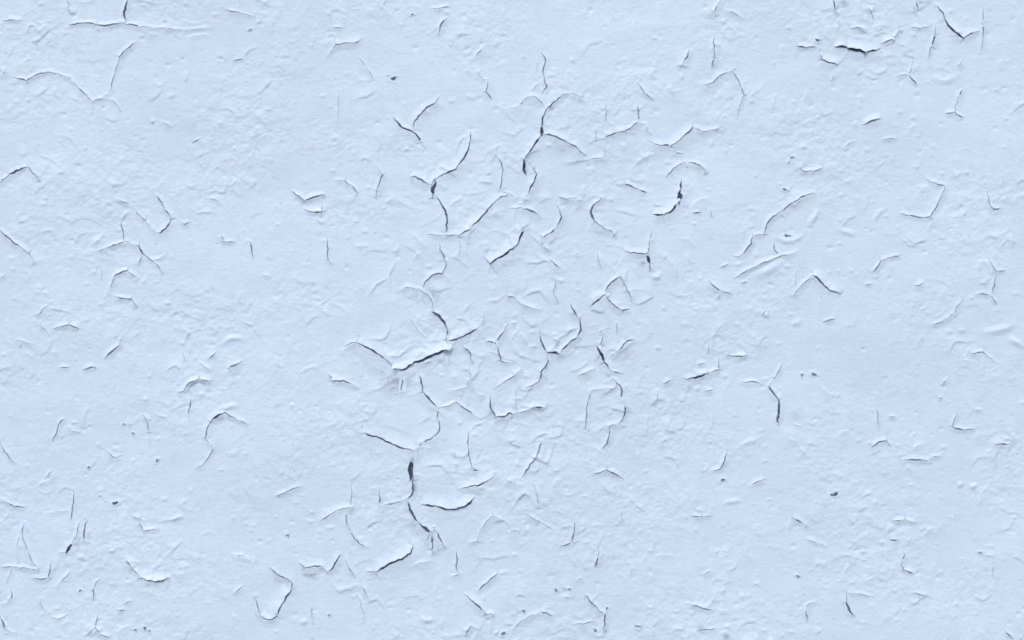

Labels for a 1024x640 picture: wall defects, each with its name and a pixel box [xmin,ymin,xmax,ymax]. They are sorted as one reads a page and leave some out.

peeling [791,23,883,72]
peeling [911,0,980,45]
peeling [482,86,727,281]
peeling [719,155,845,299]
peeling [324,282,487,399]
peeling [482,388,545,427]
peeling [418,470,572,548]
peeling [365,544,424,586]